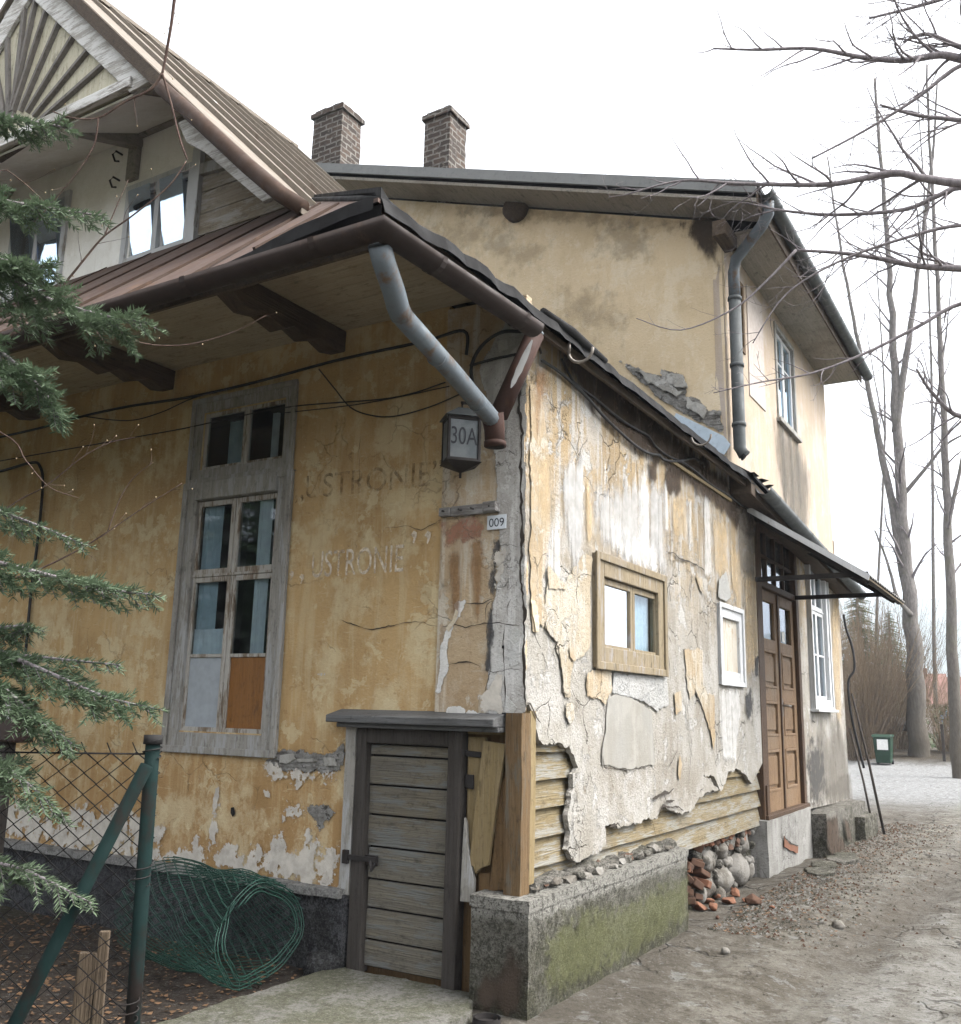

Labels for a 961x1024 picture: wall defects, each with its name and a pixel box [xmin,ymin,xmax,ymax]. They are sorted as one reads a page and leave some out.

damp [680,217,717,257]
flaking render [619,360,724,434]
crack [342,390,541,723]
peeling [446,322,593,724]
crack [666,551,706,606]
peeling [435,600,466,693]
peeling [586,648,715,749]
flaking render [263,743,345,797]
flaking render [282,800,335,831]